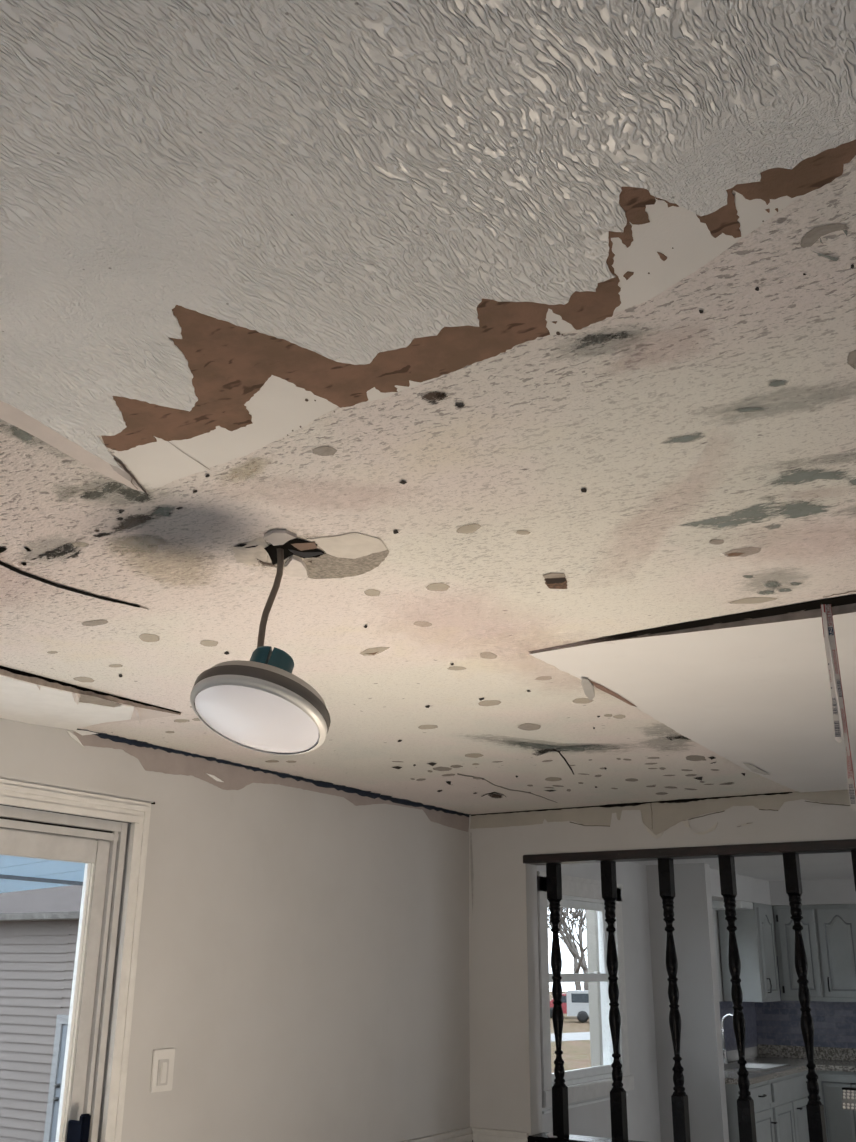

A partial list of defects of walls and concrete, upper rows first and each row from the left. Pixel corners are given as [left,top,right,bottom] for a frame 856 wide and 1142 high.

leakage [576,333,633,349]
leakage [421,391,465,408]
leakage [10,427,32,441]
leakage [664,433,705,444]
mould [772,468,856,486]
mould [32,482,174,560]
mould [682,501,830,529]
peeling [233,538,268,565]
peeling [307,532,387,559]
crack [0,561,149,610]
leakage [758,581,802,595]
leakage [503,741,631,791]